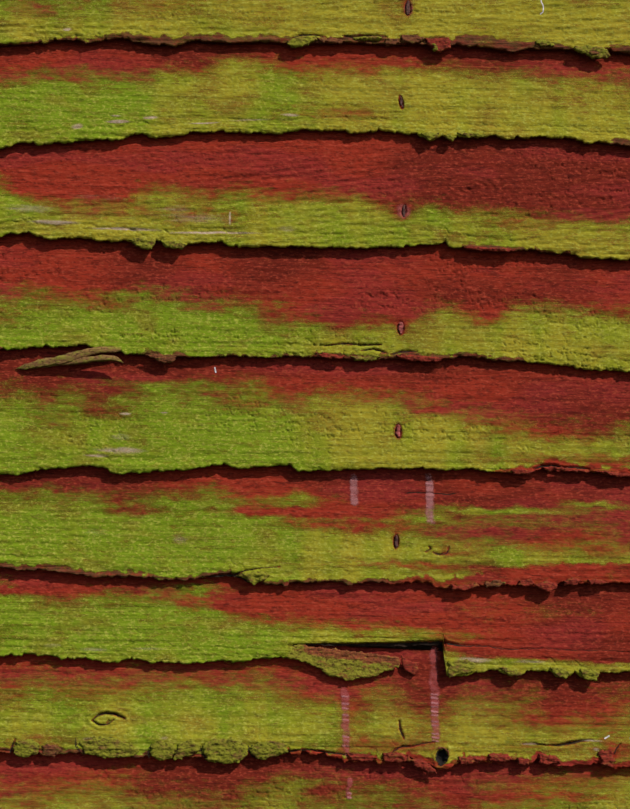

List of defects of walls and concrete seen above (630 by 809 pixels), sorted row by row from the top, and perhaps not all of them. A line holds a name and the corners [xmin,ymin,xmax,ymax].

peeling [287,35,451,53]
spalling [574,45,610,59]
crack [326,343,416,355]
crack [290,641,629,652]
peeling [347,752,437,774]
peeling [458,753,561,765]